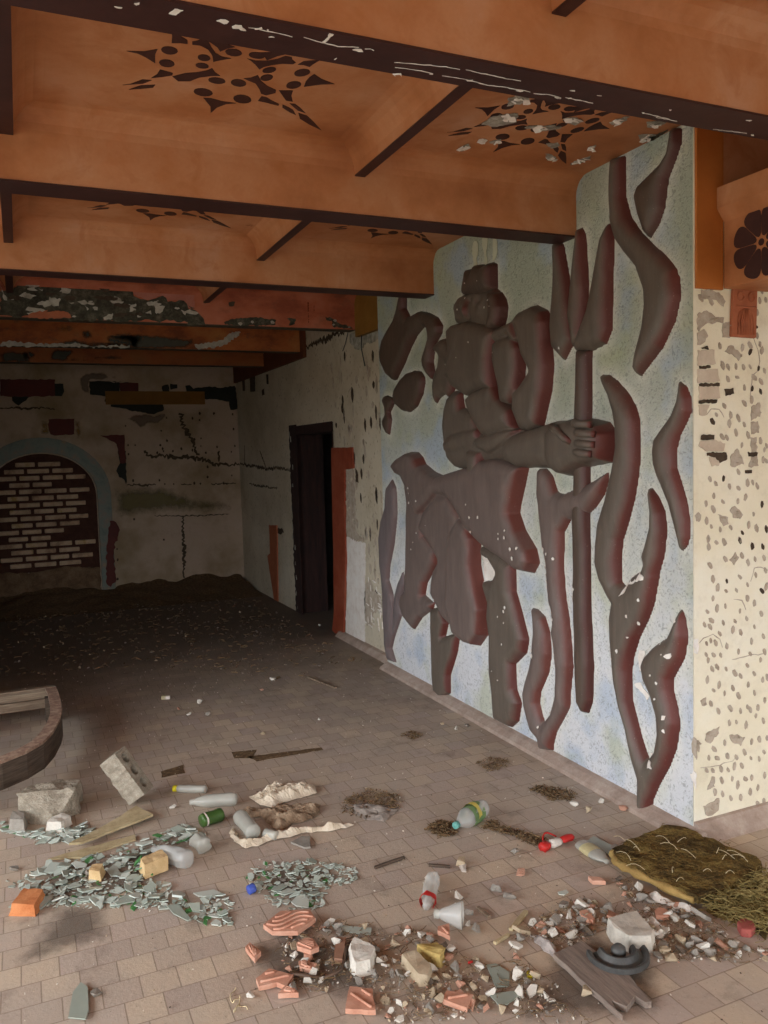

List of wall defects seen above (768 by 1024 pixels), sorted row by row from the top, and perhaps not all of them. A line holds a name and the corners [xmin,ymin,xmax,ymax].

peeling [217,19,374,60]
peeling [393,62,600,165]
peeling [28,310,71,319]
crack [144,413,291,490]
crack [154,514,227,578]